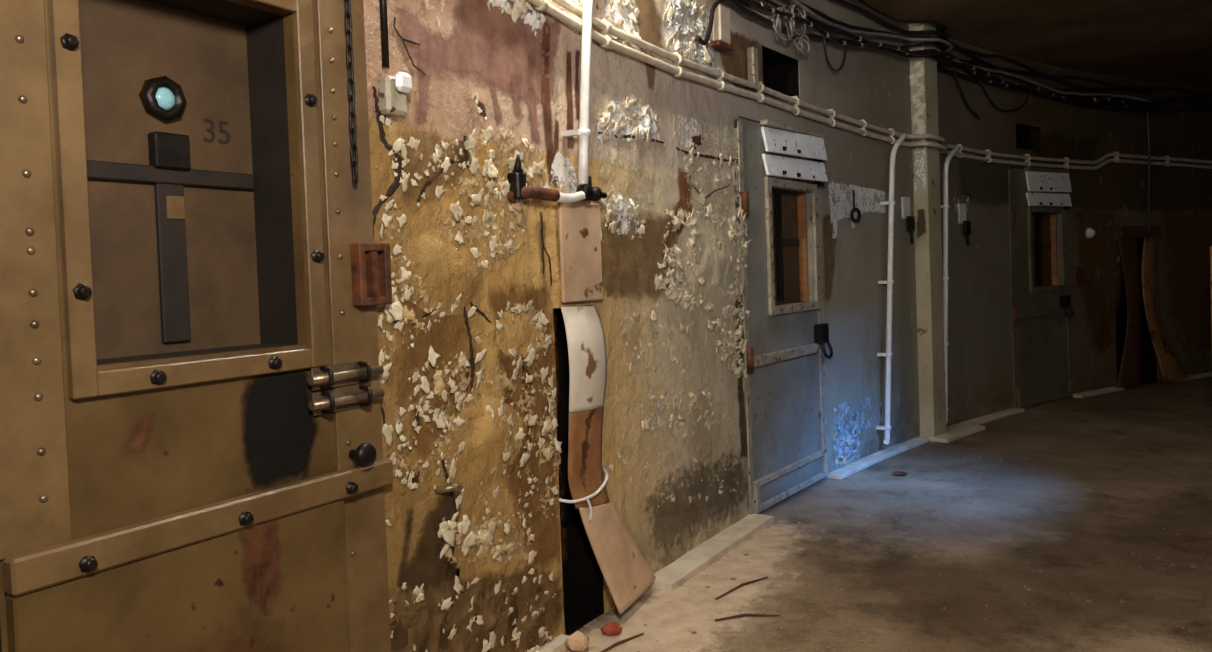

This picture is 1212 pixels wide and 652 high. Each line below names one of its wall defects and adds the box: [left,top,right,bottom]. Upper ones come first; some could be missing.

peeling [378,92,563,652]
peeling [487,0,547,36]
peeling [591,189,646,241]
peeling [596,92,660,143]
peeling [608,134,752,511]
damp [647,294,748,554]